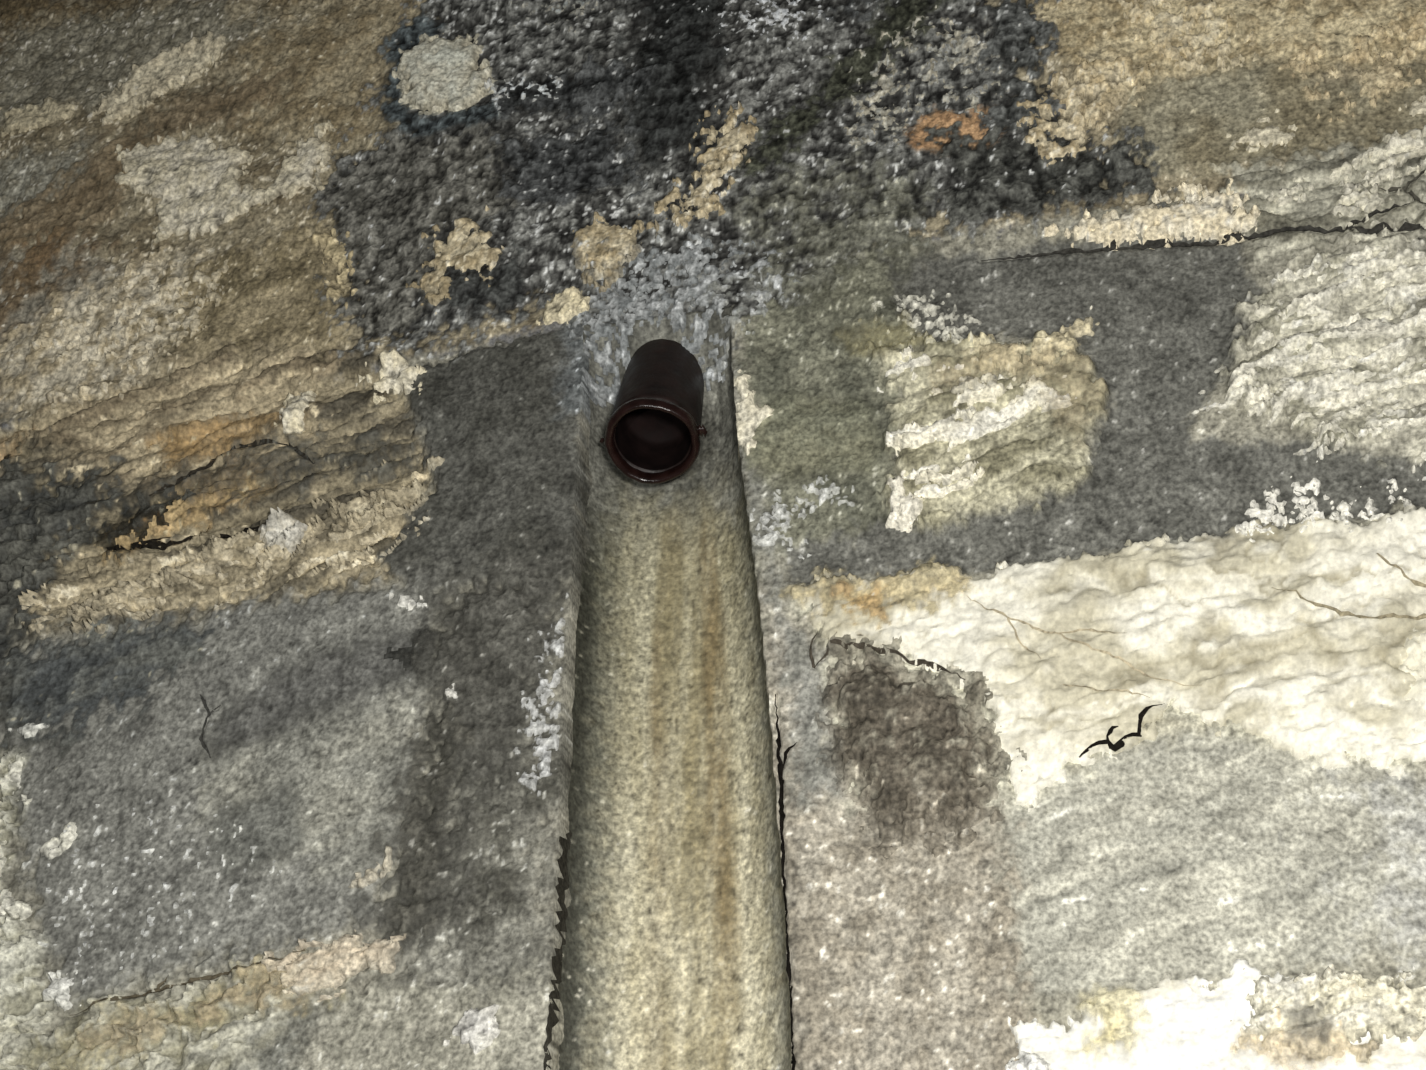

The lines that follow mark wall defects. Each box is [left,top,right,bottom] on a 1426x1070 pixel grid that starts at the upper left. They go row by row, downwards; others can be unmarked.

leakage [308,0,1177,408]
crack [981,169,1426,261]
crack [106,522,266,551]
crack [149,439,314,496]
crack [967,596,1193,757]
crack [775,694,797,1070]